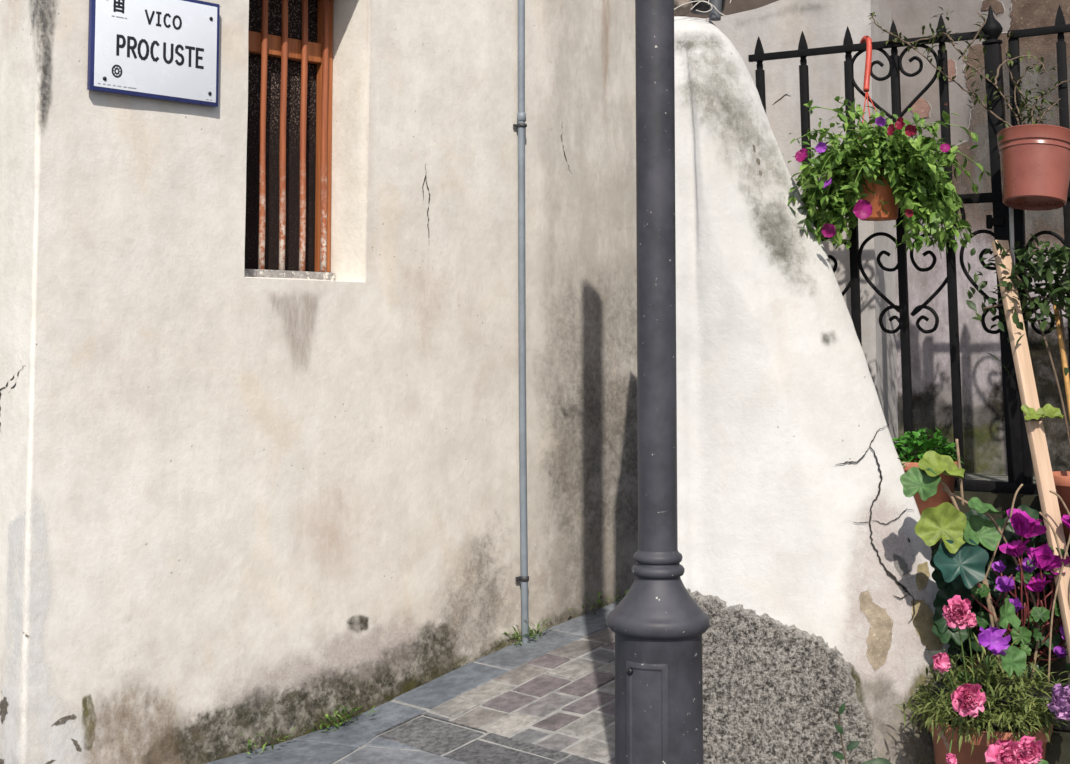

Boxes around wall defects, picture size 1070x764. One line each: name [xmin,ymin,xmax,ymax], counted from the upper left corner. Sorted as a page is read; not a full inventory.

damp [32,0,52,120]
crack [422,164,430,231]
damp [688,55,782,185]
damp [760,203,803,262]
peeling [948,40,994,251]
peeling [981,0,1070,128]
peeling [1014,211,1064,254]
crack [836,424,917,624]
spalling [0,691,9,724]
damp [107,554,498,764]
peeling [857,587,893,674]
peeling [892,554,943,652]